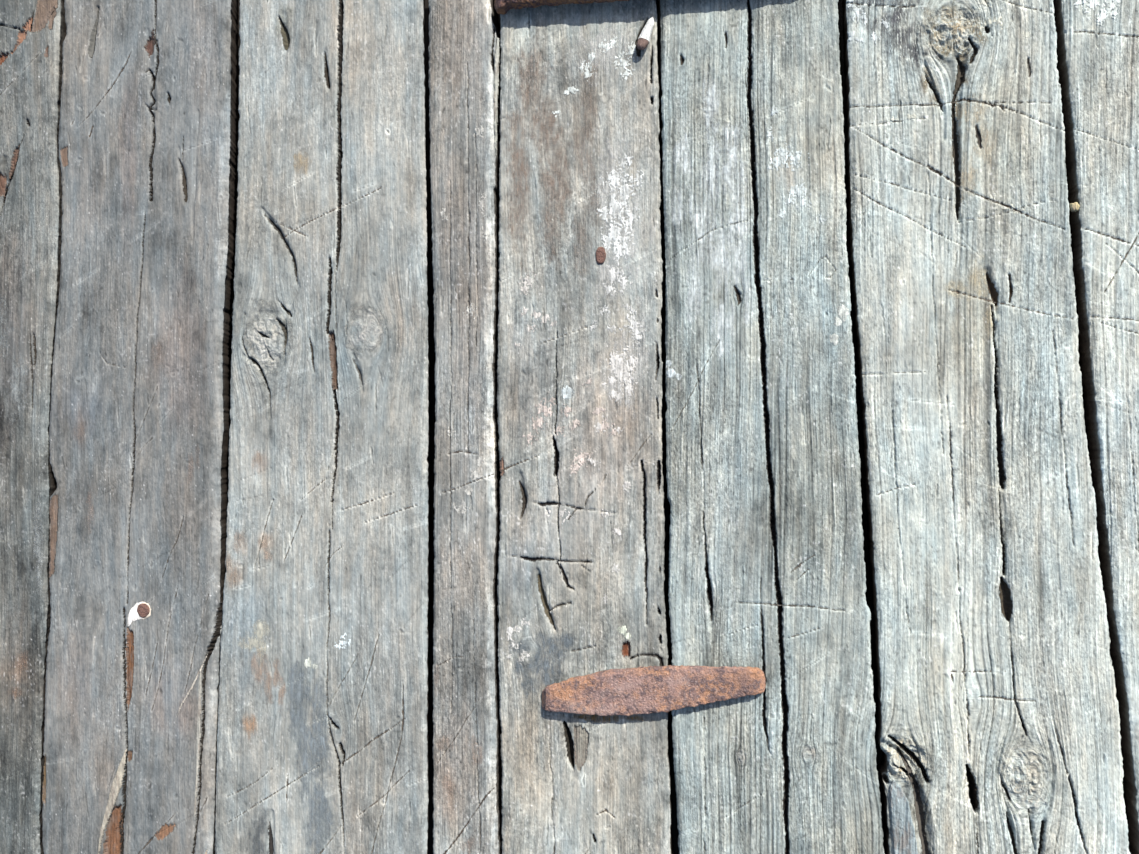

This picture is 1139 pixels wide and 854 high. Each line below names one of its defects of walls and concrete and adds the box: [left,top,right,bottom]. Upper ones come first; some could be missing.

crack [326,0,347,334]
crack [925,38,978,230]
crack [119,0,159,854]
crack [326,360,363,853]
crack [745,0,790,854]
crack [960,621,970,749]
crack [990,305,1006,575]